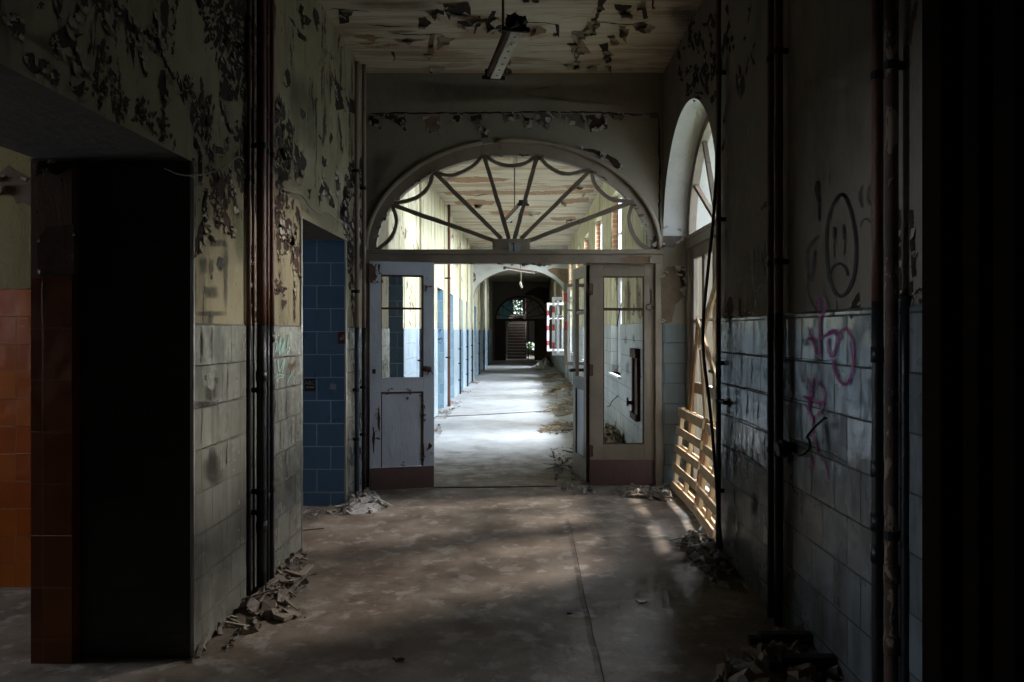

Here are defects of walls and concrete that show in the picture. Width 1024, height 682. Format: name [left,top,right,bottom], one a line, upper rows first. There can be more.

peeling [288,4,322,42]
peeling [338,9,353,24]
peeling [353,2,502,61]
peeling [527,0,657,73]
peeling [675,4,755,105]
peeling [502,111,608,132]
peeling [0,160,74,207]
peeling [24,0,257,323]
peeling [274,68,419,327]
peeling [406,388,433,461]